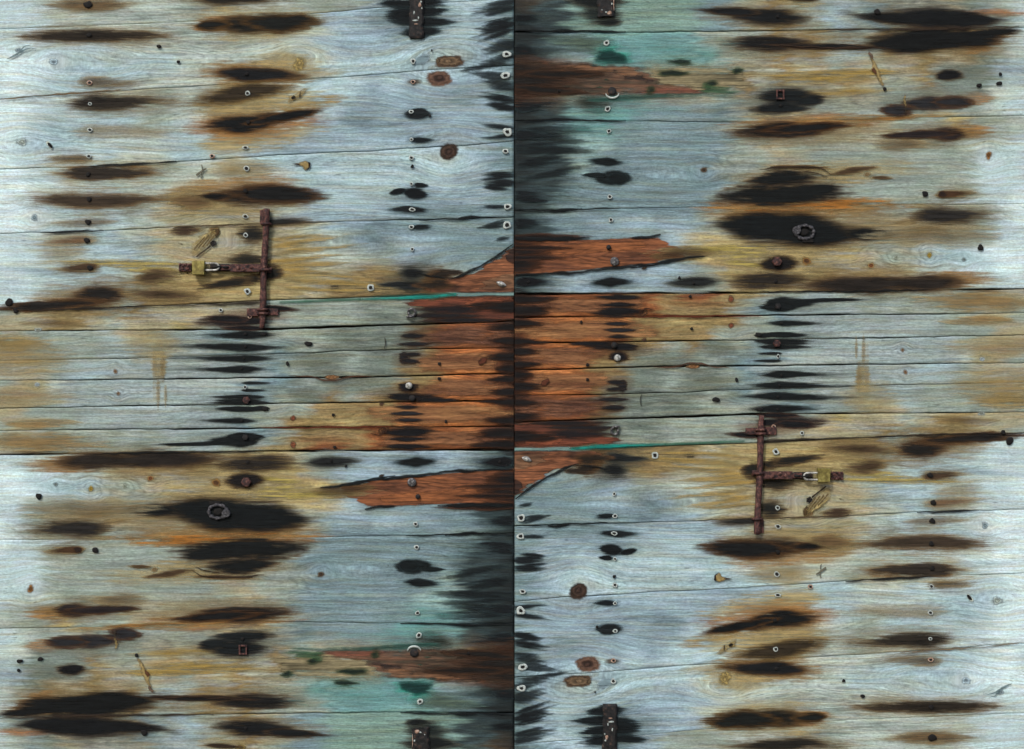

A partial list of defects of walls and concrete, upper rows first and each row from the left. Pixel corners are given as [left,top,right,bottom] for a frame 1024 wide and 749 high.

crack [419,207,705,279]
water stain [654,165,996,428]
water stain [23,315,371,580]
crack [320,464,608,537]